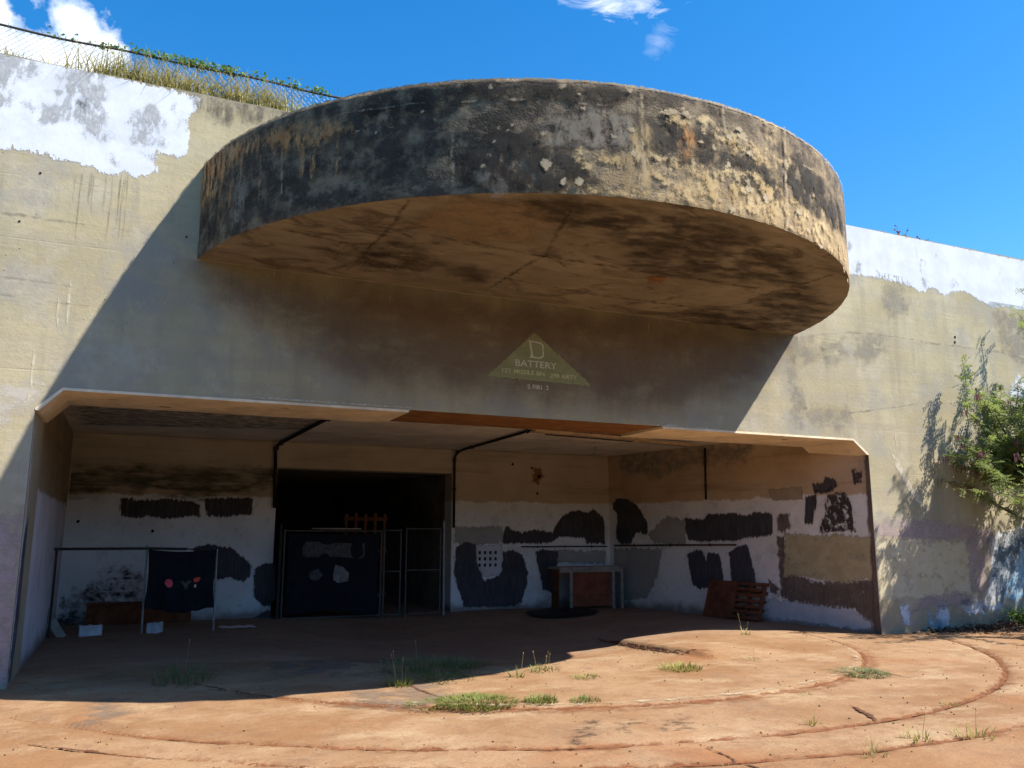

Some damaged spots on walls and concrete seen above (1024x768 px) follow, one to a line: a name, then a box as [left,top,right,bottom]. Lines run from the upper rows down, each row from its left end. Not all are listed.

peeling [0,54,201,179]
damp [207,103,263,122]
damp [232,81,844,401]
peeling [221,77,1024,310]